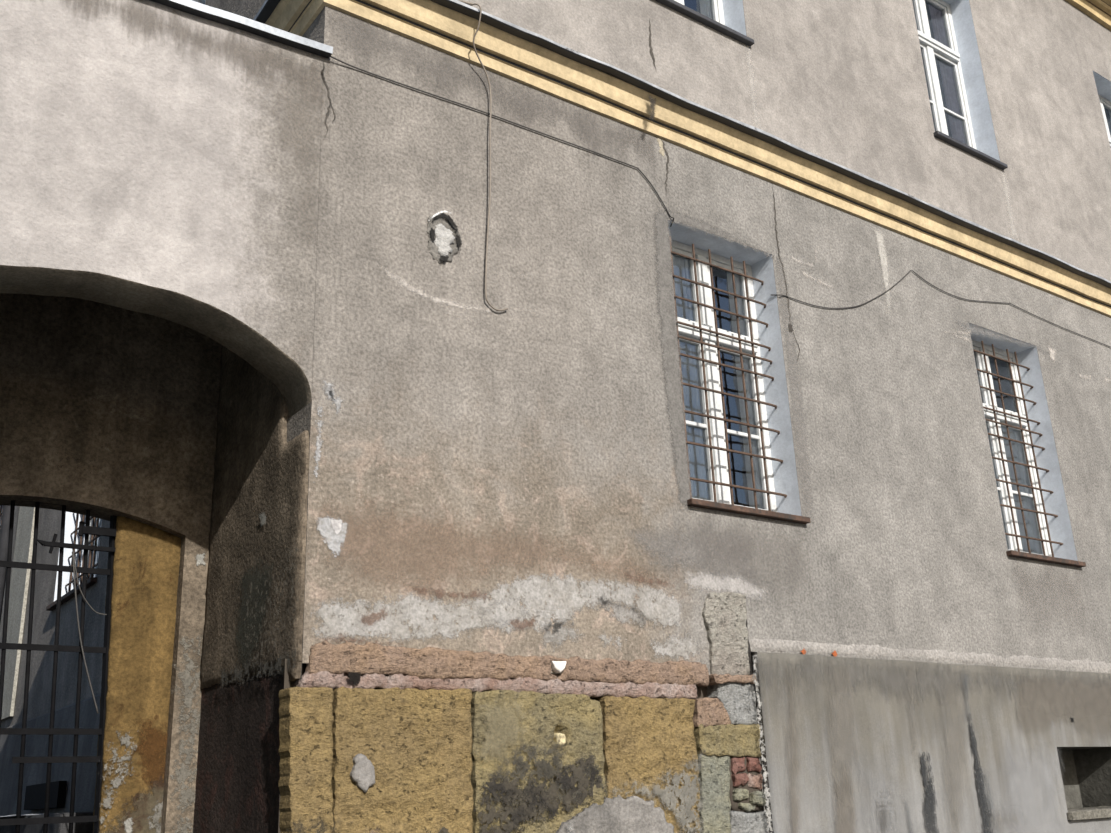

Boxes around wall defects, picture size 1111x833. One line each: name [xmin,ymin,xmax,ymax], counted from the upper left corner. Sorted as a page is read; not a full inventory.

crack [321,67,336,140]
spalling [426,210,462,264]
crack [772,185,800,361]
peeling [317,516,347,557]
water stain [236,562,273,669]
flaking render [221,547,700,688]
peeling [100,731,137,827]
peeling [147,636,202,833]
water stain [482,702,604,810]
water stain [752,655,773,833]
water stain [921,752,939,833]
water stain [968,714,993,833]